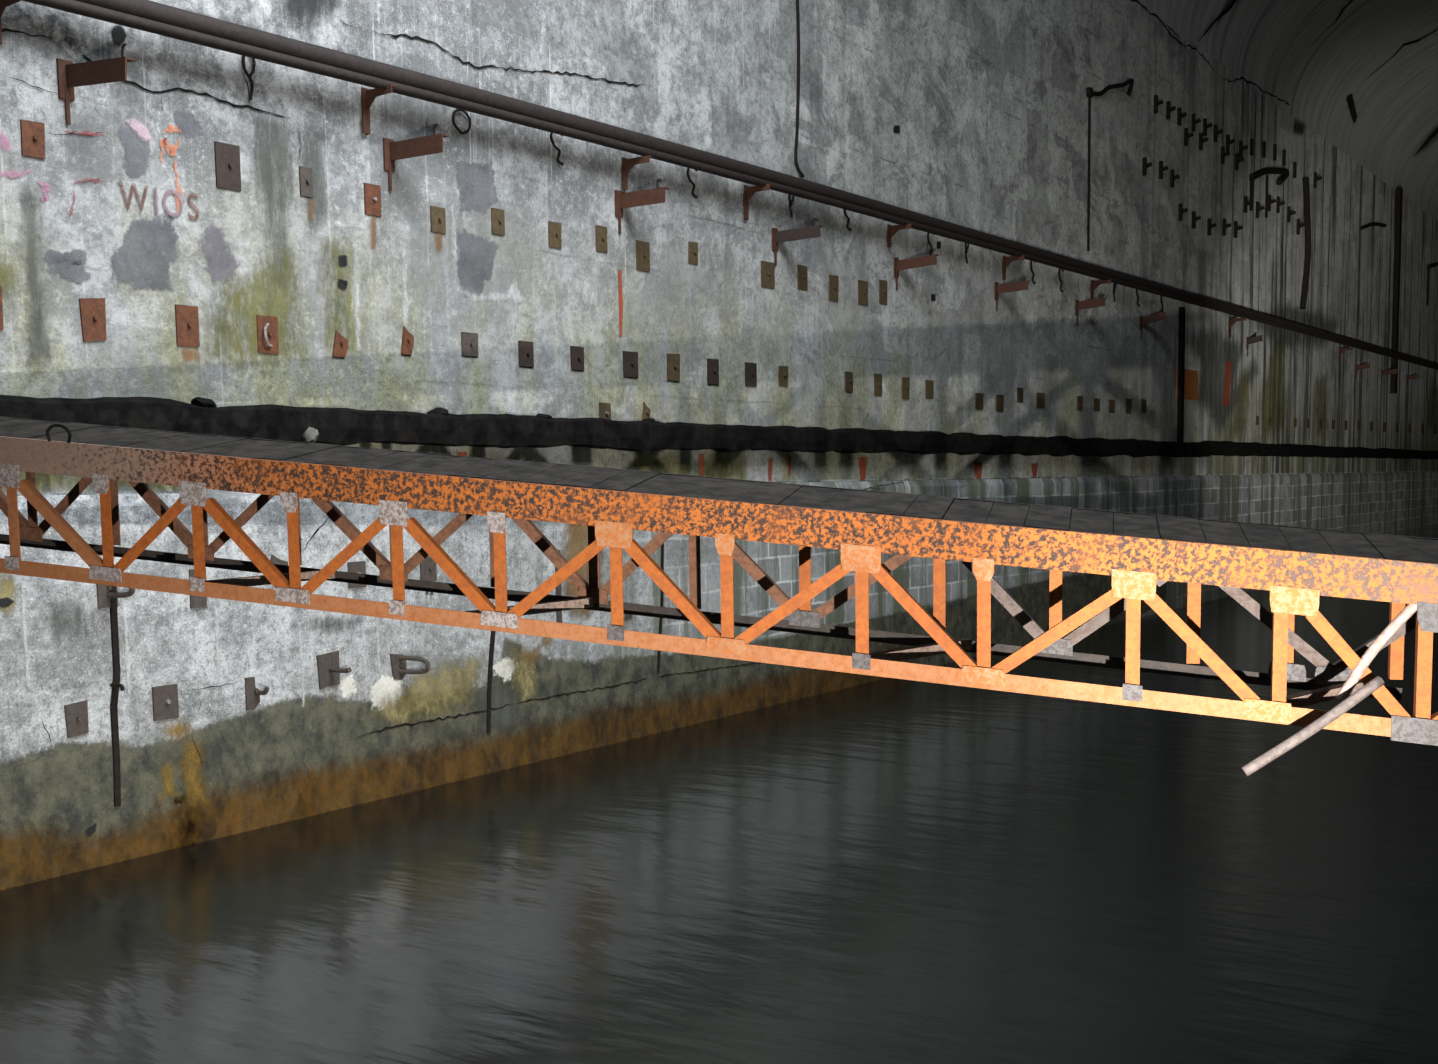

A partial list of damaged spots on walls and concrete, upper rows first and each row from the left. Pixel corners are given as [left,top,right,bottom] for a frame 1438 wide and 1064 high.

crack [2,28,92,61]
leakage [288,0,336,25]
crack [334,15,649,98]
crack [124,64,302,163]
corrosion [565,524,602,617]
leakage [1101,583,1167,627]
leakage [0,573,1112,886]
corrosion [0,669,888,890]